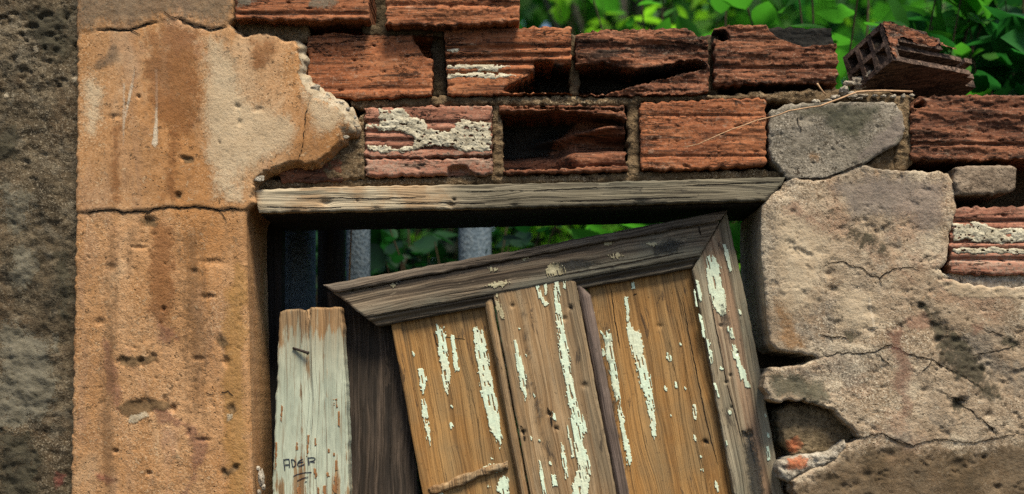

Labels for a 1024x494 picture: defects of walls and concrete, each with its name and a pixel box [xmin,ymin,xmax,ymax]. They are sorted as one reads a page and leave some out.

crack [102,12,223,34]
peeling [294,40,361,140]
crack [77,206,246,223]
crack [820,256,918,284]
crack [814,326,1018,447]
spalling [118,398,172,423]